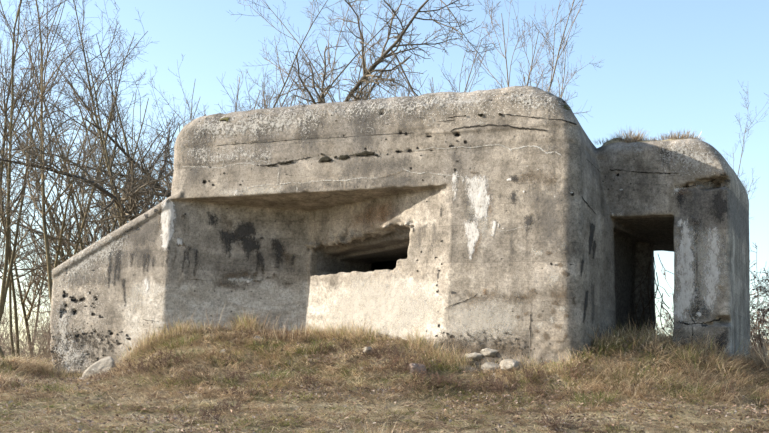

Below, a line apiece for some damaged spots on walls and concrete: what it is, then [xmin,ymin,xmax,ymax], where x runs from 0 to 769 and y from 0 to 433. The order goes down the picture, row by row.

crack [182,114,577,190]
crack [592,164,677,174]
water stain [144,200,198,273]
water stain [207,210,294,274]
water stain [452,160,490,259]
water stain [107,250,133,306]
crack [679,309,723,342]